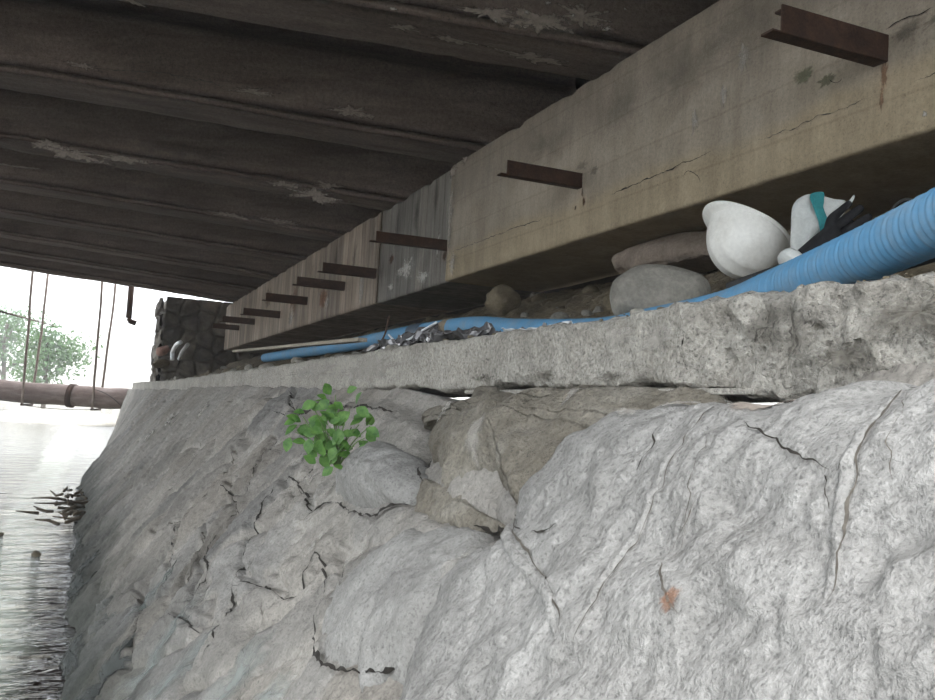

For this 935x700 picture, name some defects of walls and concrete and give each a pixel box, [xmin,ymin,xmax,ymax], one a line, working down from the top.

spalling [438,1,612,35]
crack [761,98,868,140]
spalling [31,138,153,166]
crack [614,153,707,194]
crack [272,390,400,415]
crack [745,387,915,603]
crack [165,442,413,674]